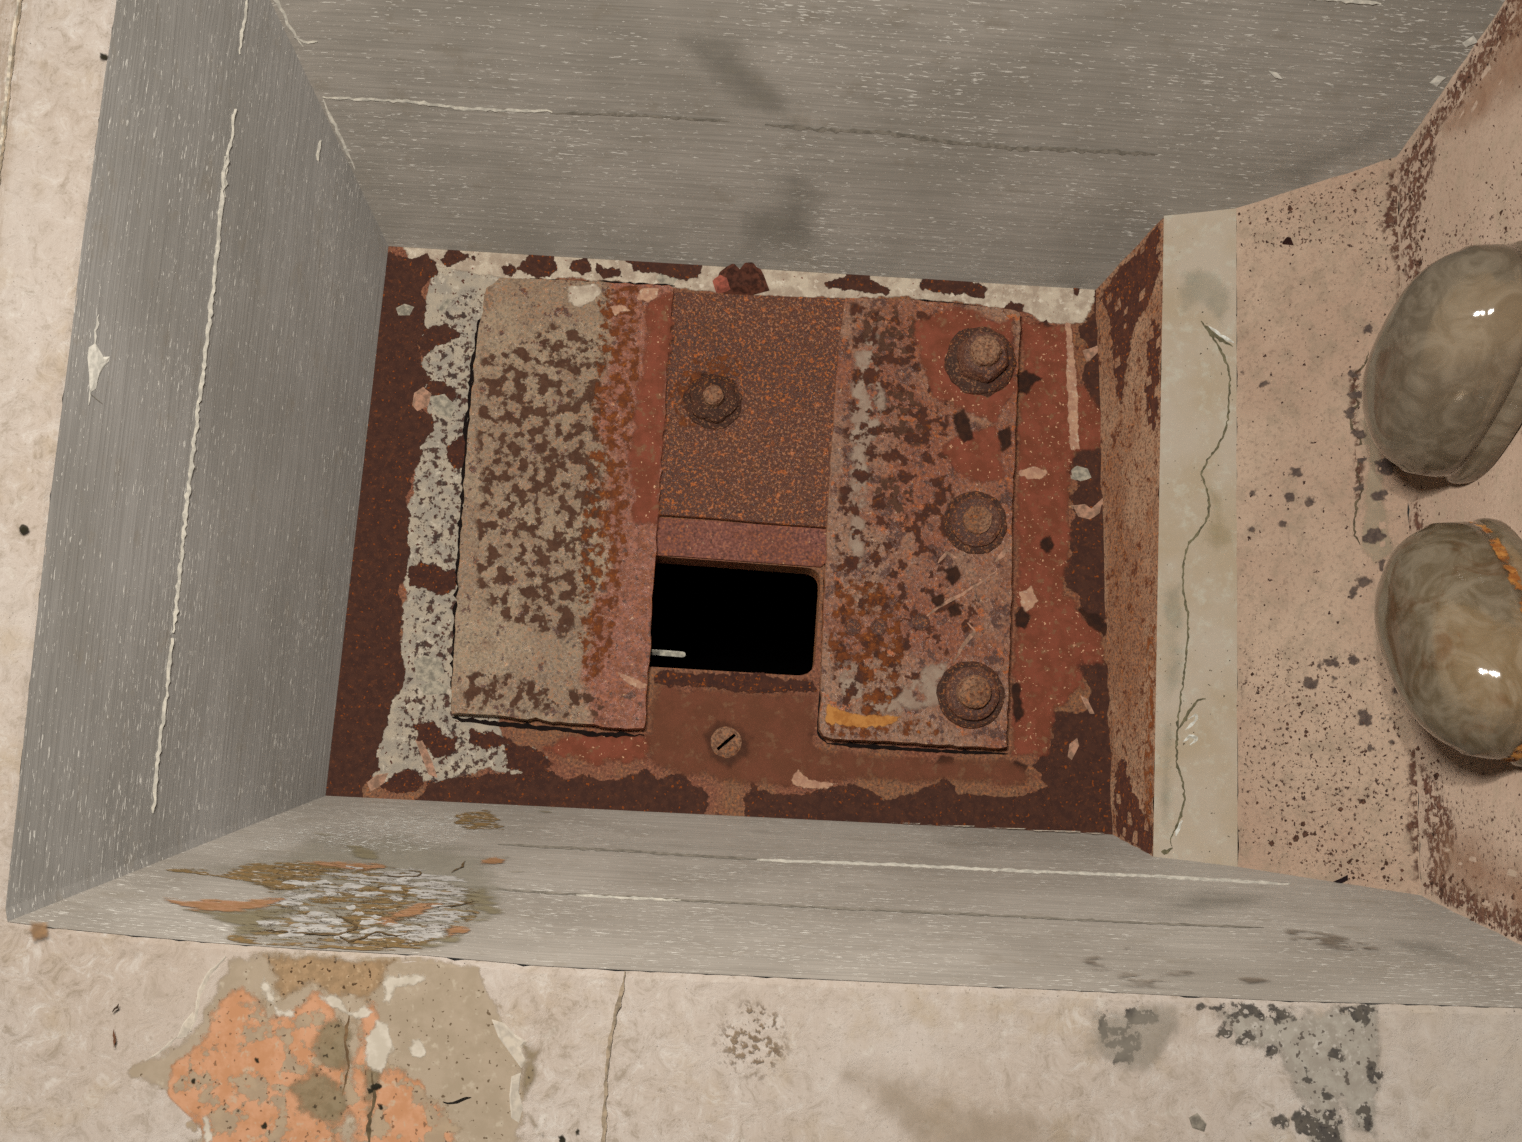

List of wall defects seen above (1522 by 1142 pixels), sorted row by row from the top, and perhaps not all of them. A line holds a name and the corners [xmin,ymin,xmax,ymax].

corrosion [1420,0,1522,135]
corrosion [1073,226,1162,431]
corrosion [325,250,709,814]
corrosion [446,255,1053,739]
corrosion [1063,446,1106,620]
crack [1161,321,1234,855]
corrosion [1468,521,1522,612]
peeling [145,810,505,1061]
corrosion [743,625,1156,853]
corrosion [1428,761,1522,941]